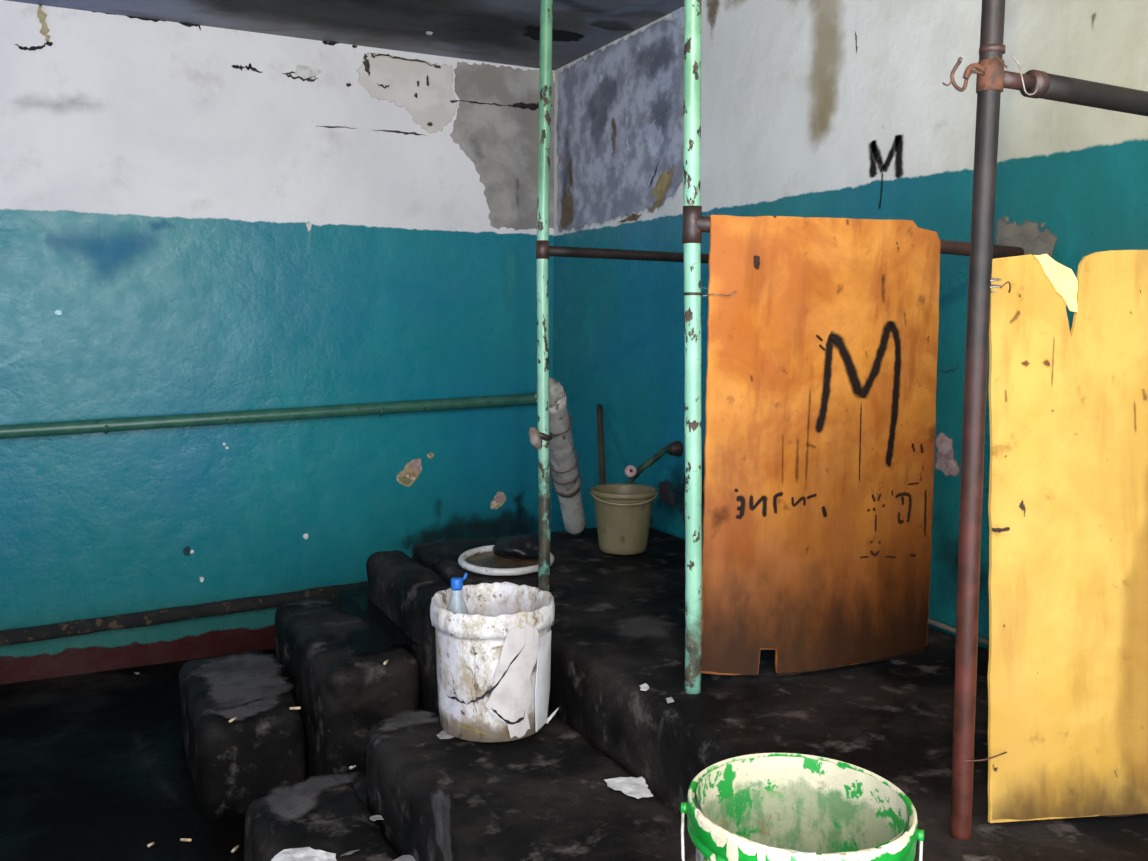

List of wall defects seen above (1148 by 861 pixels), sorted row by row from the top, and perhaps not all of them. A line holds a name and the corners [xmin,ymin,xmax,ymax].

crack [15,4,53,51]
crack [92,11,201,31]
leakage [206,0,529,46]
crack [232,41,437,89]
leakage [814,0,836,127]
spalling [346,53,555,230]
leakage [556,7,684,232]
spalling [397,452,434,487]
spalling [490,491,506,510]